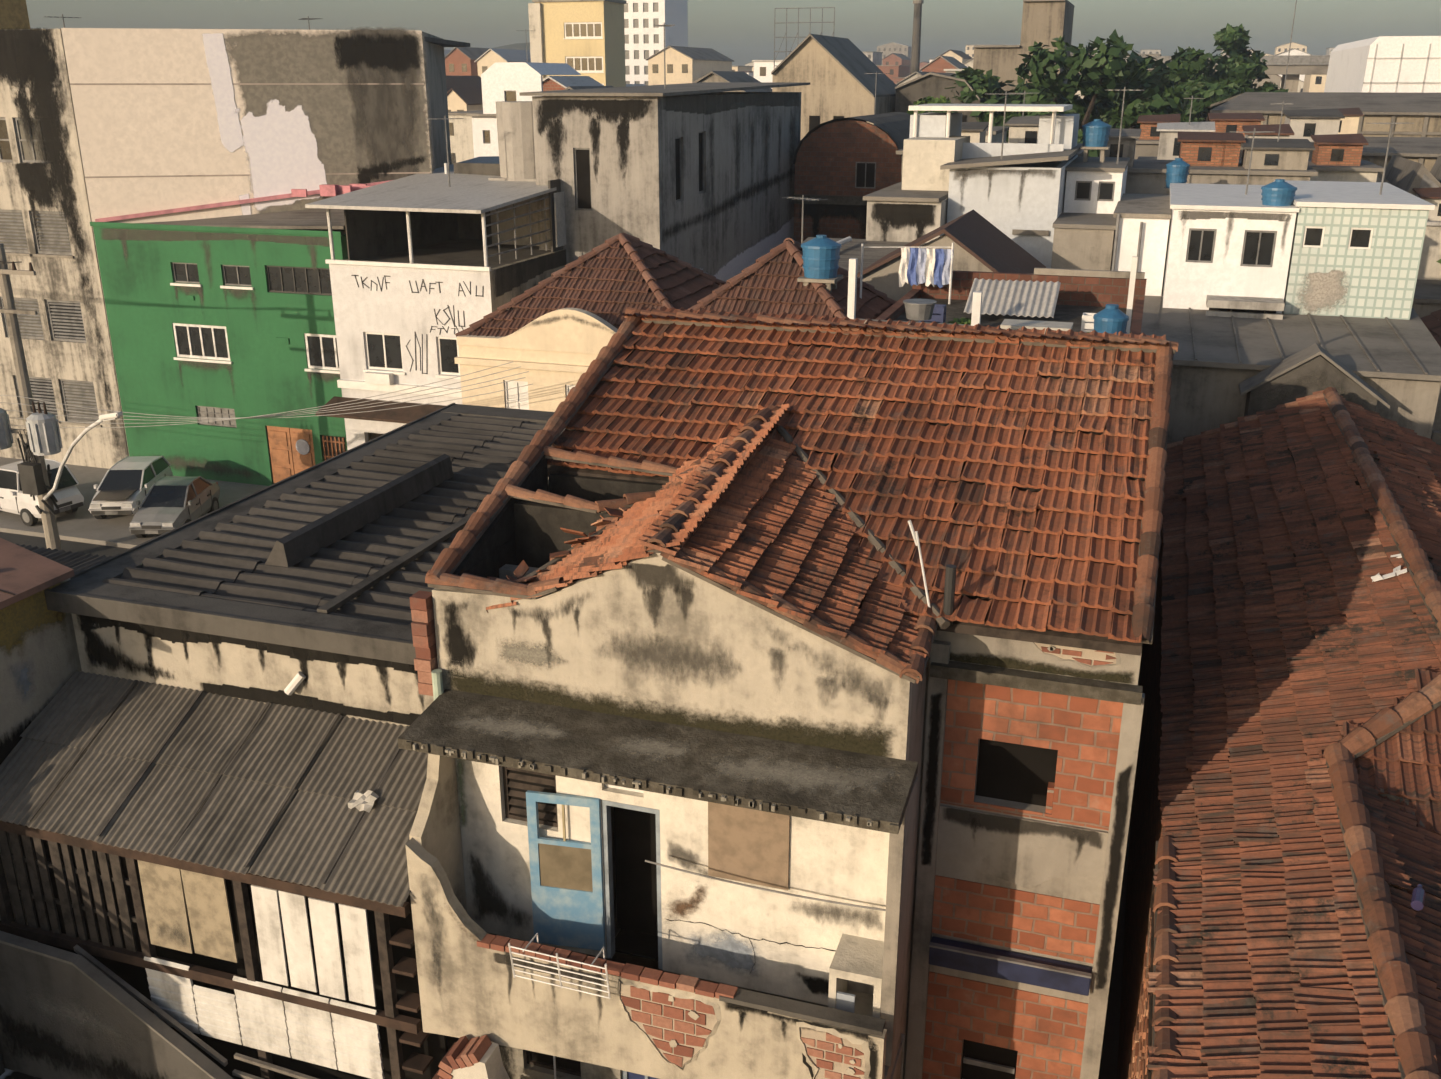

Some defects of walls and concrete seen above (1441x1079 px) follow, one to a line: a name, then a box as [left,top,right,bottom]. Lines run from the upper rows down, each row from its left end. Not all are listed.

peeling [225,31,375,214]
water stain [334,35,420,132]
peeling [410,35,431,174]
water stain [537,99,652,179]
water stain [0,28,112,407]
water stain [77,614,423,705]
water stain [444,603,475,667]
water stain [512,602,579,653]
water stain [629,563,694,623]
spalling [616,978,721,1070]
crack [802,1053,815,1079]
spalling [796,1022,870,1079]